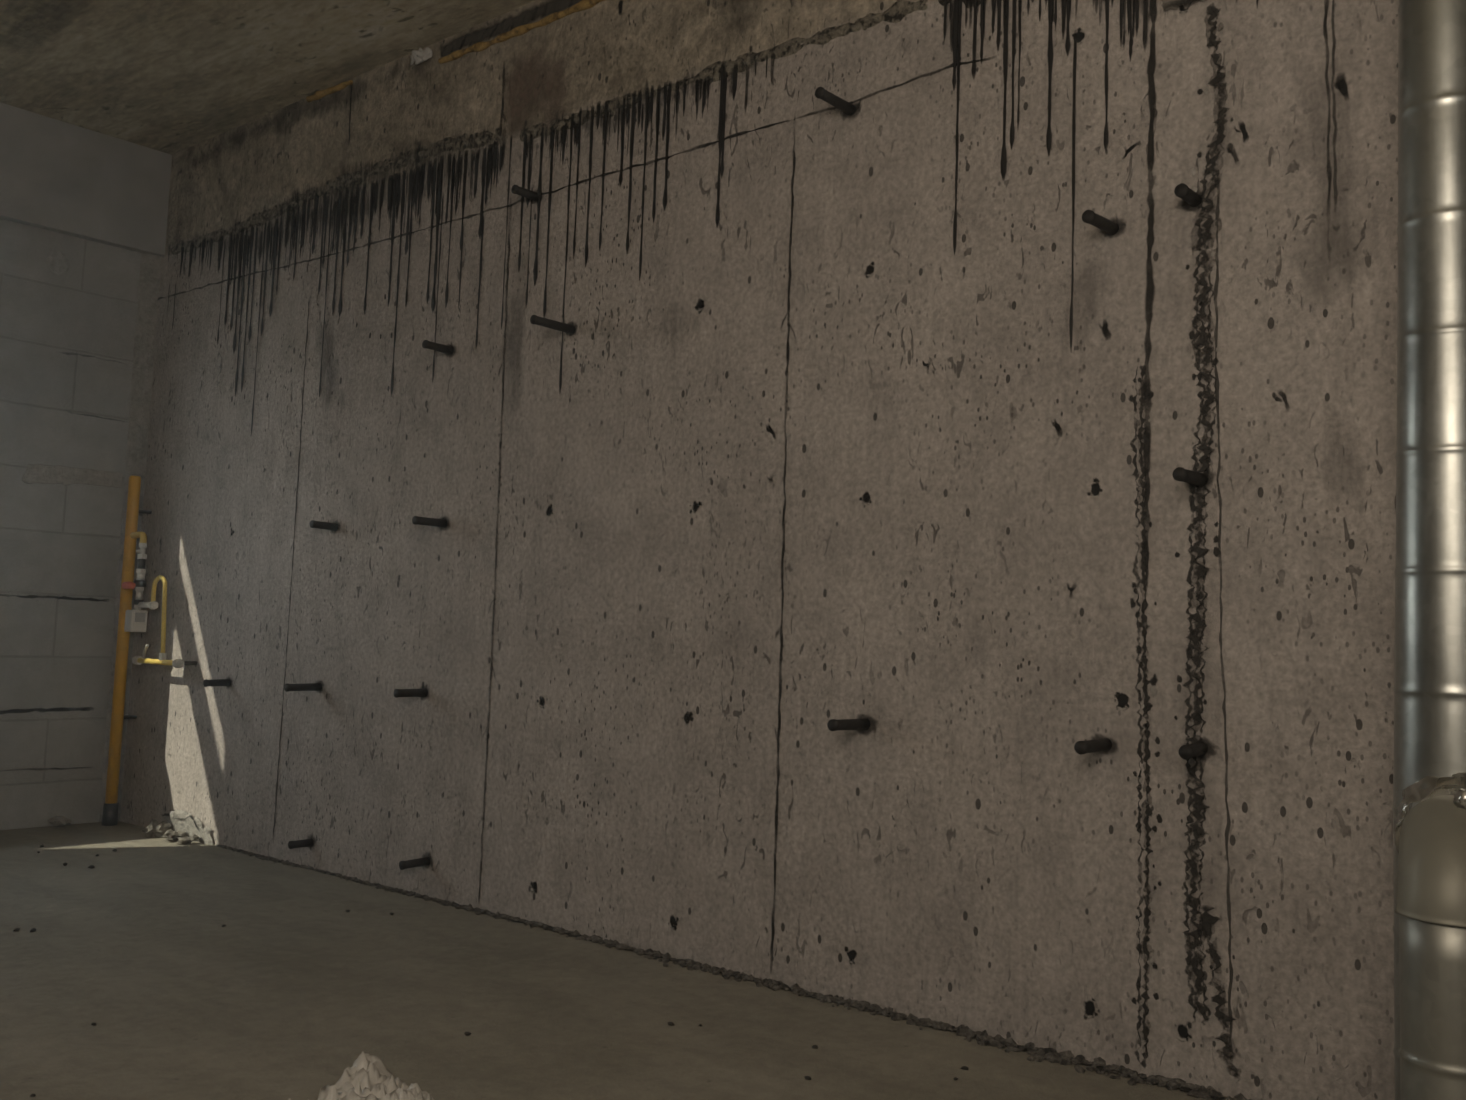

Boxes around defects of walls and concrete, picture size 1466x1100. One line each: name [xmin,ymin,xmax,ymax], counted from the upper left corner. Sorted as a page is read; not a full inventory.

damp [167,55,774,433]
damp [943,0,1077,349]
damp [1095,0,1148,151]